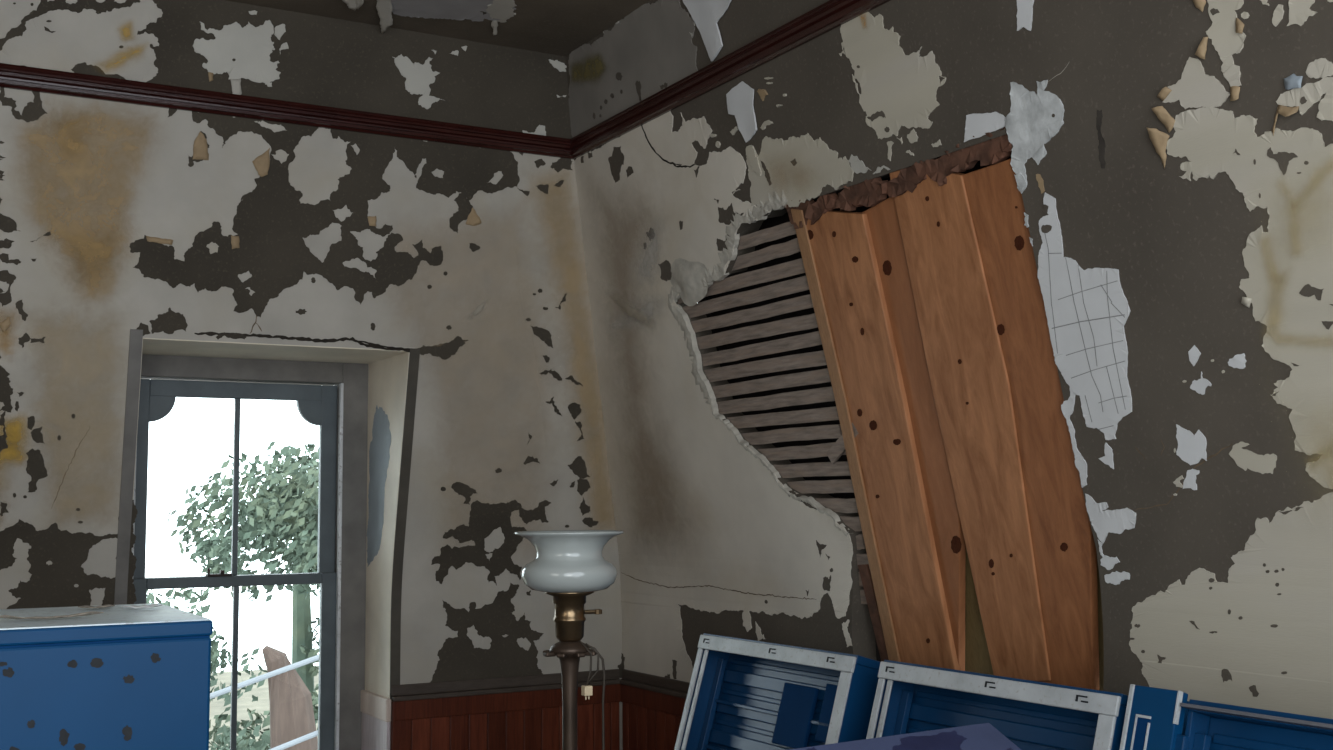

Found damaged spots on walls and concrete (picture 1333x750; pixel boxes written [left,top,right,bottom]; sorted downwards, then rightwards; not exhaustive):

peeling [0,0,163,82]
flaking render [0,87,47,122]
peeling [1014,173,1027,191]
flaking render [0,198,51,348]
crack [194,315,468,352]
peeling [129,0,1012,683]
peeling [1129,0,1333,719]
damp [0,421,23,461]
peeling [1061,393,1114,488]
flaking render [0,356,162,619]
peeling [1098,540,1130,585]